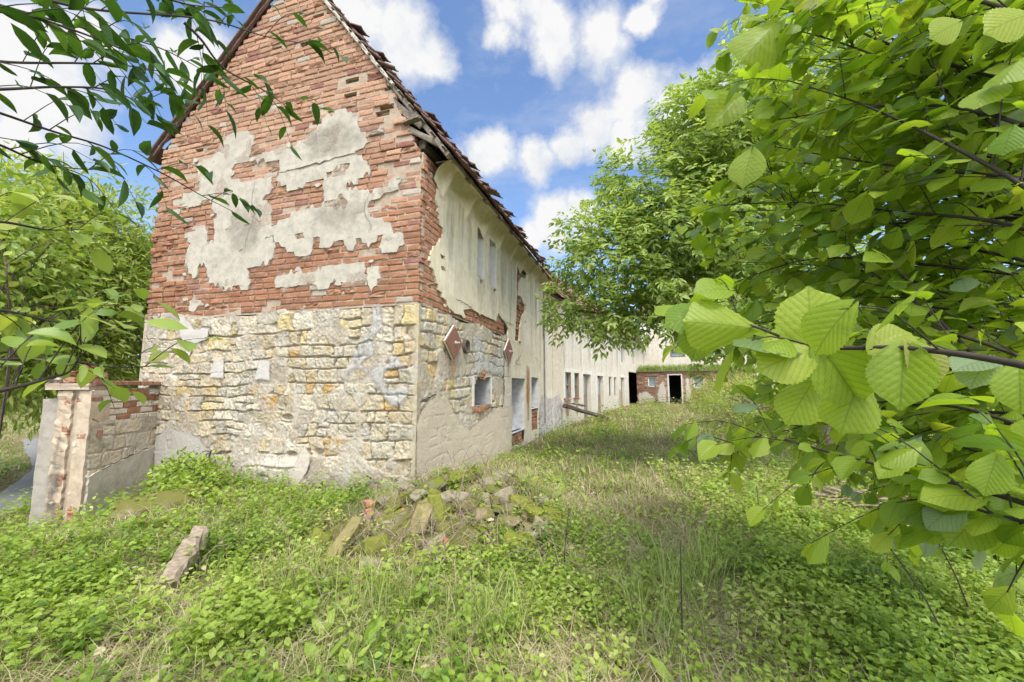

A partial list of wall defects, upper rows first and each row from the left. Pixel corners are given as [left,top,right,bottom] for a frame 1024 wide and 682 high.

peeling [173,108,405,292]
peeling [179,295,209,356]
spalling [515,267,527,343]
peeling [210,359,224,378]
peeling [255,360,270,380]
peeling [503,357,511,408]
peeling [282,446,310,489]